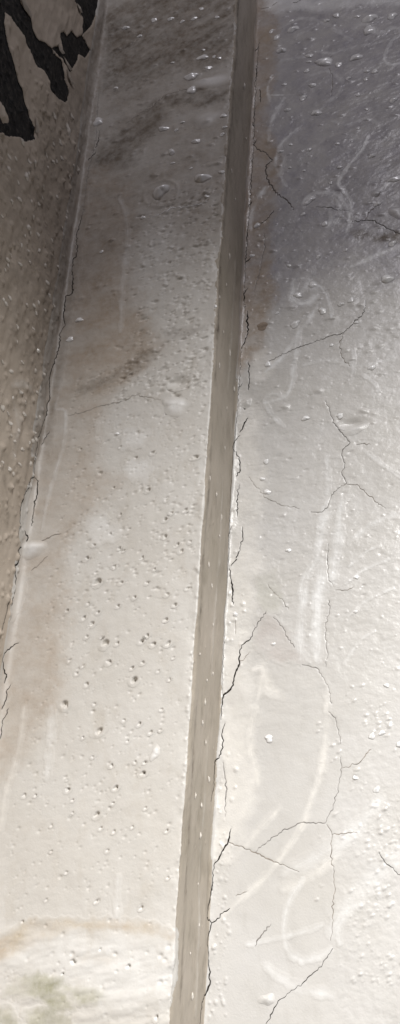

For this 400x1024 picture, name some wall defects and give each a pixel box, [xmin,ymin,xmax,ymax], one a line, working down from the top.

peeling [0,0,98,142]
crack [0,95,159,738]
crack [200,42,400,1023]
water stain [0,975,96,1024]